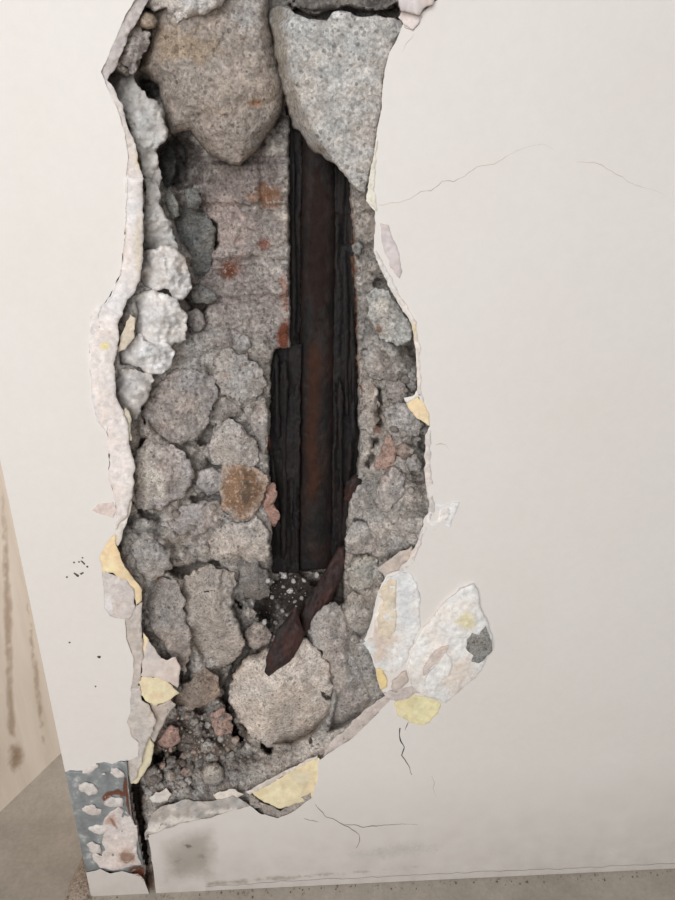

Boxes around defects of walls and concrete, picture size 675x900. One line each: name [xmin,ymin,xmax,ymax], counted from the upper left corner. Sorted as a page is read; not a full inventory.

crack [385,146,552,205]
rust [280,155,297,347]
rust [265,361,289,559]
spalling [92,0,493,881]
rust [337,297,362,546]
rust [102,778,132,815]
crack [304,806,416,848]
crack [399,723,437,797]
rust [121,853,152,887]